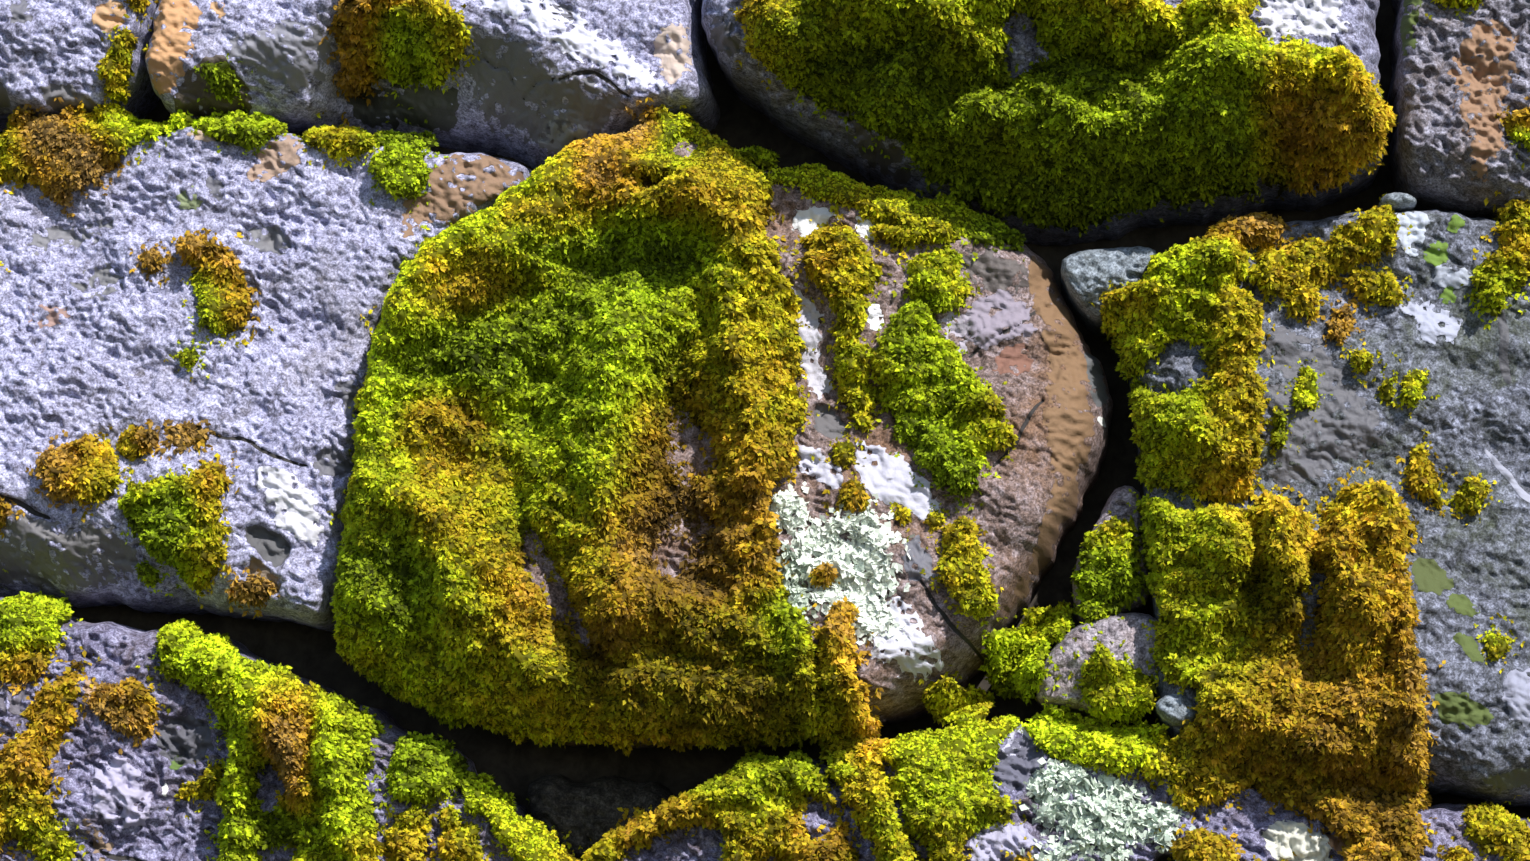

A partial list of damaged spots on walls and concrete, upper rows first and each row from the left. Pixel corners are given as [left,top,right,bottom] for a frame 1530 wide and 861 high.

crack [486,61,631,100]
crack [213,433,308,466]